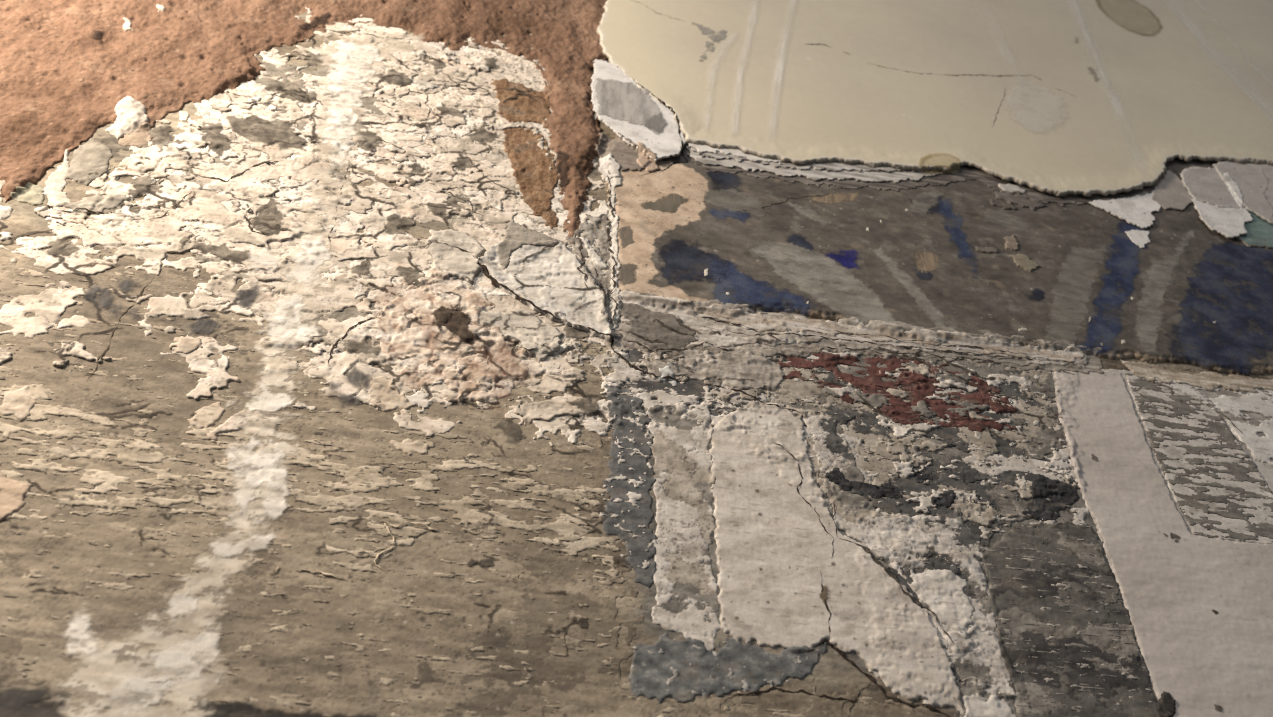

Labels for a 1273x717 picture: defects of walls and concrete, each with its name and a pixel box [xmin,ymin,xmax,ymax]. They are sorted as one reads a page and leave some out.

damp [1096,0,1161,36]
crack [0,27,1085,454]
peeling [0,280,101,339]
peeling [46,335,111,371]
peeling [160,323,240,400]
peeling [187,402,269,441]
peeling [388,438,430,463]
peeling [0,468,47,522]
crack [27,479,72,499]
crack [139,485,201,557]
crack [555,502,614,556]
crack [722,442,953,717]